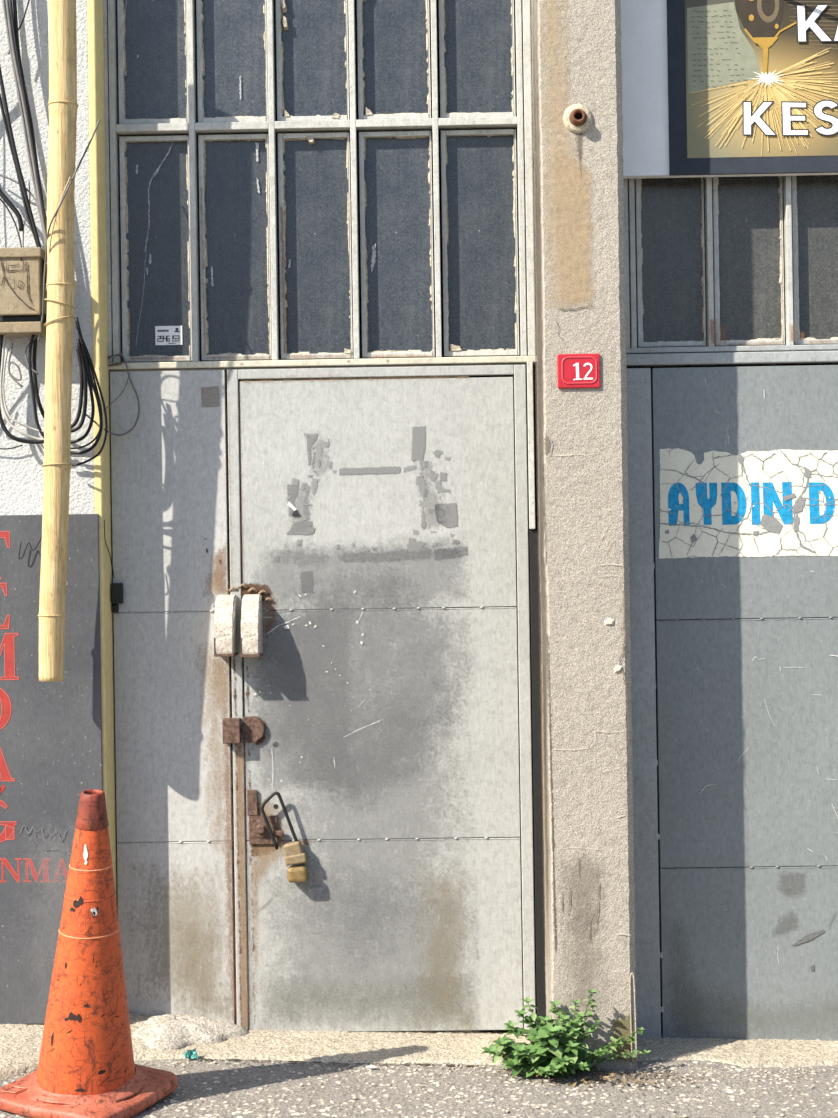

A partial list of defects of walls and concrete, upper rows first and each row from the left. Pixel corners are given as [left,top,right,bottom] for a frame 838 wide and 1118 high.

peeling [273,426,468,563]
corrosion [241,582,273,630]
peeling [298,571,313,597]
corrosion [214,638,281,1027]